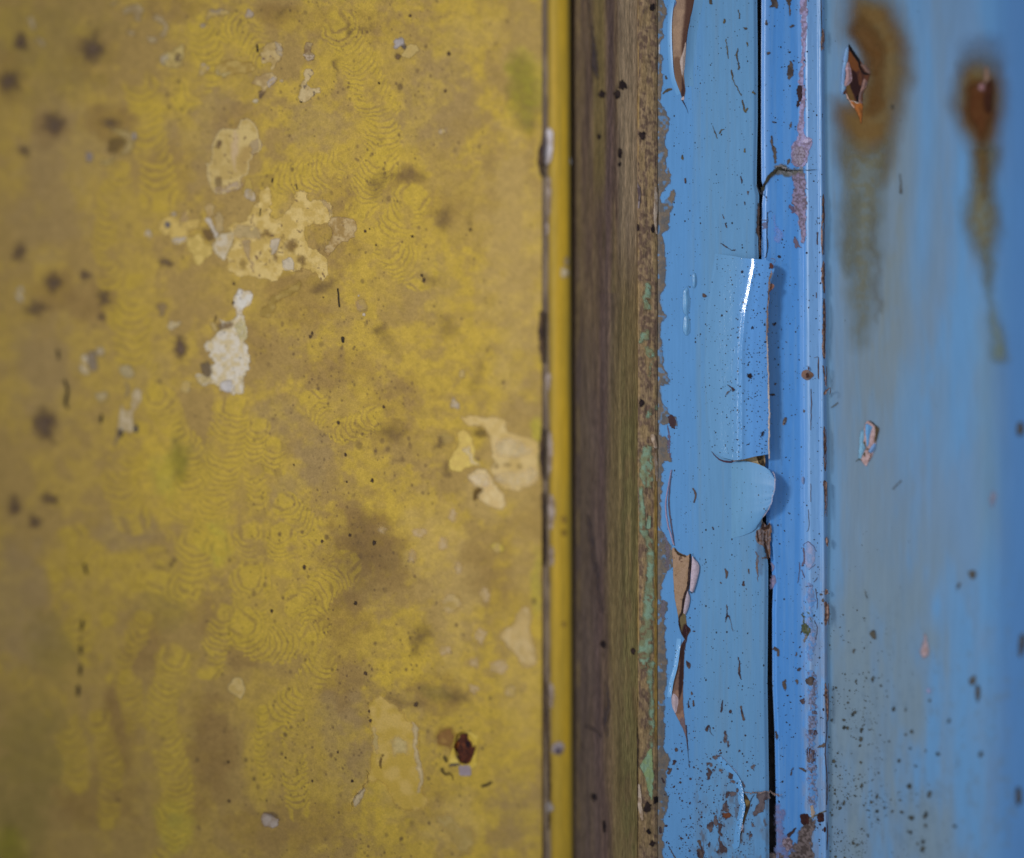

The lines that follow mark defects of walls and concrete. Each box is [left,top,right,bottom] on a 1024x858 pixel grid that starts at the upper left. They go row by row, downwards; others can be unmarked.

peeling [145,118,357,395]
crack [756,0,815,259]
peeling [774,0,812,248]
peeling [845,62,870,123]
rust [837,0,906,324]
rust [957,49,1001,274]
peeling [449,399,553,510]
peeling [658,0,703,858]
peeling [858,421,879,466]
peeling [717,756,754,850]
crack [768,555,776,854]